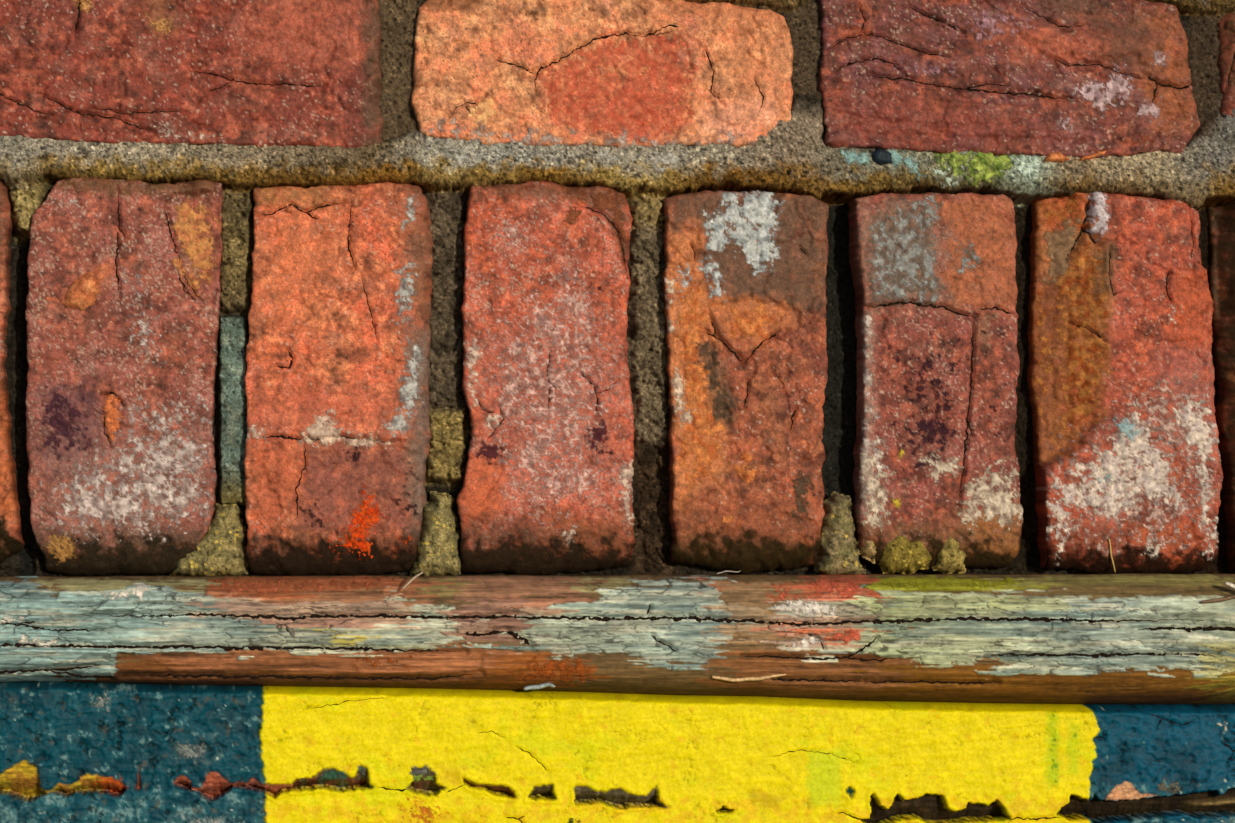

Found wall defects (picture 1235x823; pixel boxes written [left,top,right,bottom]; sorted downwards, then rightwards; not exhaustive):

crack [496,24,678,91]
crack [258,202,377,338]
crack [252,435,398,516]
leakage [859,315,894,569]
crack [865,301,1014,504]
leakage [919,453,1023,569]
leakage [1044,355,1219,574]
leakage [910,532,944,572]
peeling [175,766,373,801]
peeling [574,786,665,809]
peeling [861,794,1008,823]
peeling [1058,778,1235,823]